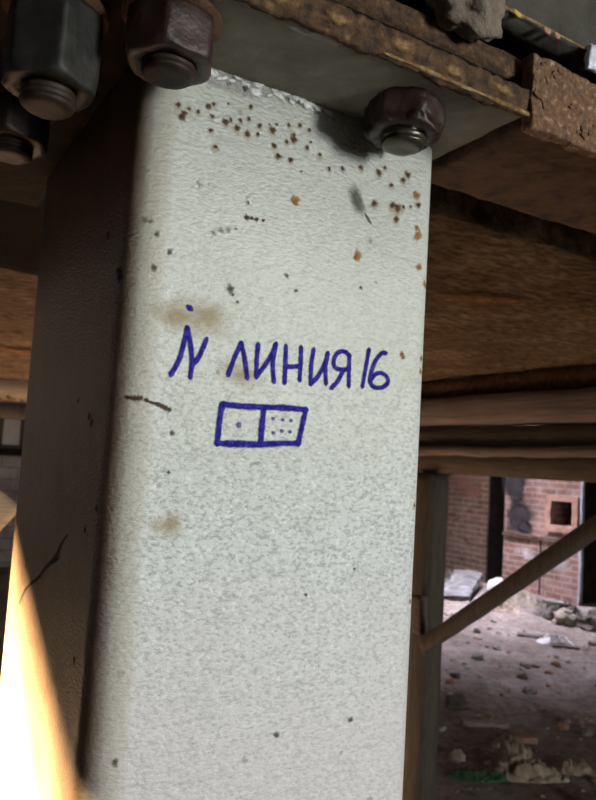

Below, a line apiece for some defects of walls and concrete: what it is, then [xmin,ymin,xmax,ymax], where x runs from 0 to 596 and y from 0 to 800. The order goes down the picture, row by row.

corrosion [330,13,347,24]
corrosion [506,6,585,49]
corrosion [385,38,596,159]
corrosion [223,105,278,136]
crack [19,534,68,603]